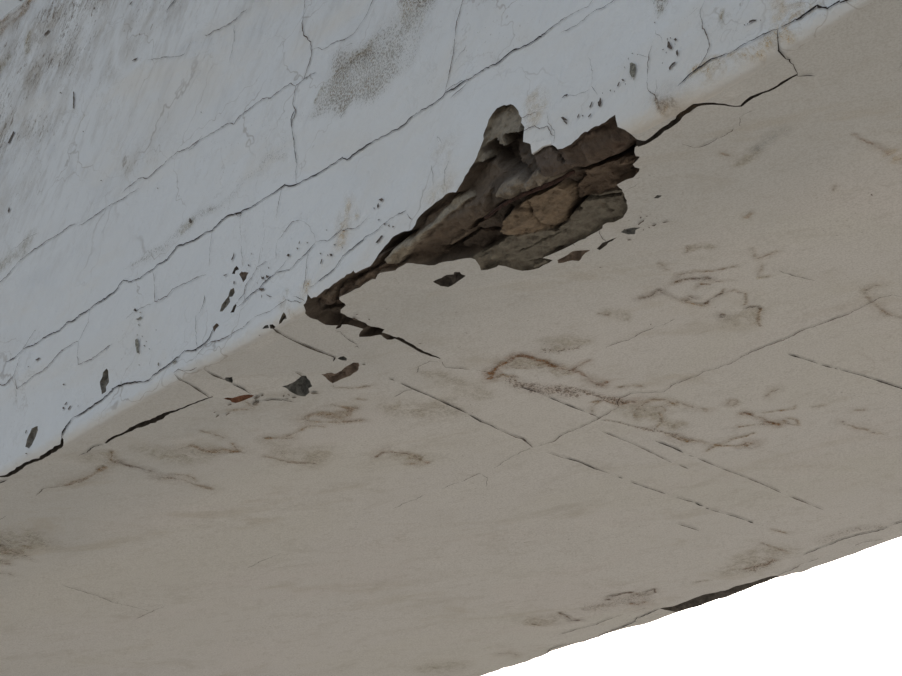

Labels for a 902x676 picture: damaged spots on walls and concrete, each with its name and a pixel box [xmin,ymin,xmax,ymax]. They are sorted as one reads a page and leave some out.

peeling [561,53,638,124]
crack [636,0,848,147]
crack [0,0,614,483]
spalling [304,104,666,340]
rust [487,348,642,406]
crack [395,295,902,523]